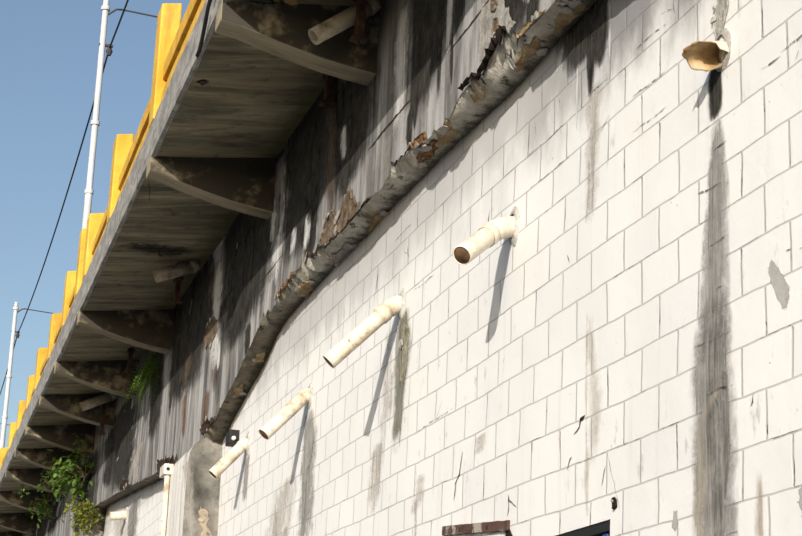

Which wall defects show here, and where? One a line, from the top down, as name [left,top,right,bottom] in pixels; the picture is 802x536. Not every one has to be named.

damp [394,0,465,146]
crack [447,0,489,54]
peeling [458,0,548,103]
damp [493,0,539,52]
spalling [554,0,587,35]
damp [708,60,722,120]
spalling [710,0,729,40]
spalling [391,118,459,169]
spalling [304,187,372,266]
damp [694,129,736,536]
damp [385,312,410,440]